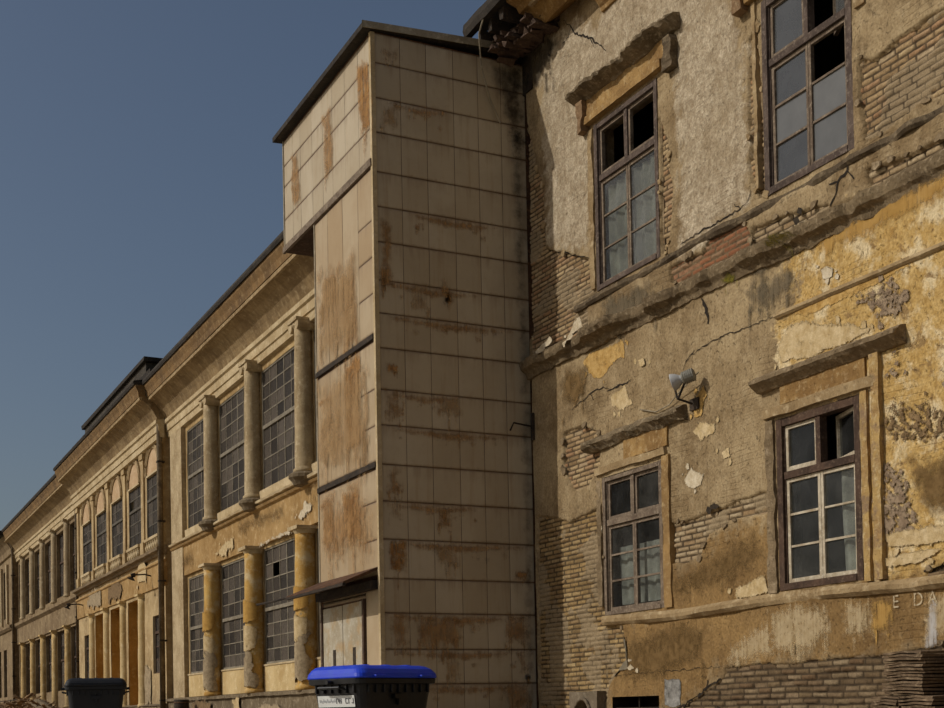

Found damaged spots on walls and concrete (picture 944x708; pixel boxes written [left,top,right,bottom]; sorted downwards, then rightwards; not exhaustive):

crack [563,20,606,51]
corrosion [357,63,372,143]
spalling [528,136,597,355]
crack [681,190,751,244]
crack [829,166,854,206]
crack [683,298,772,369]
crack [572,380,630,410]
spalling [882,391,944,444]
spalling [560,421,601,490]
peeling [871,462,944,576]
damp [911,458,944,511]
spalling [294,613,313,683]